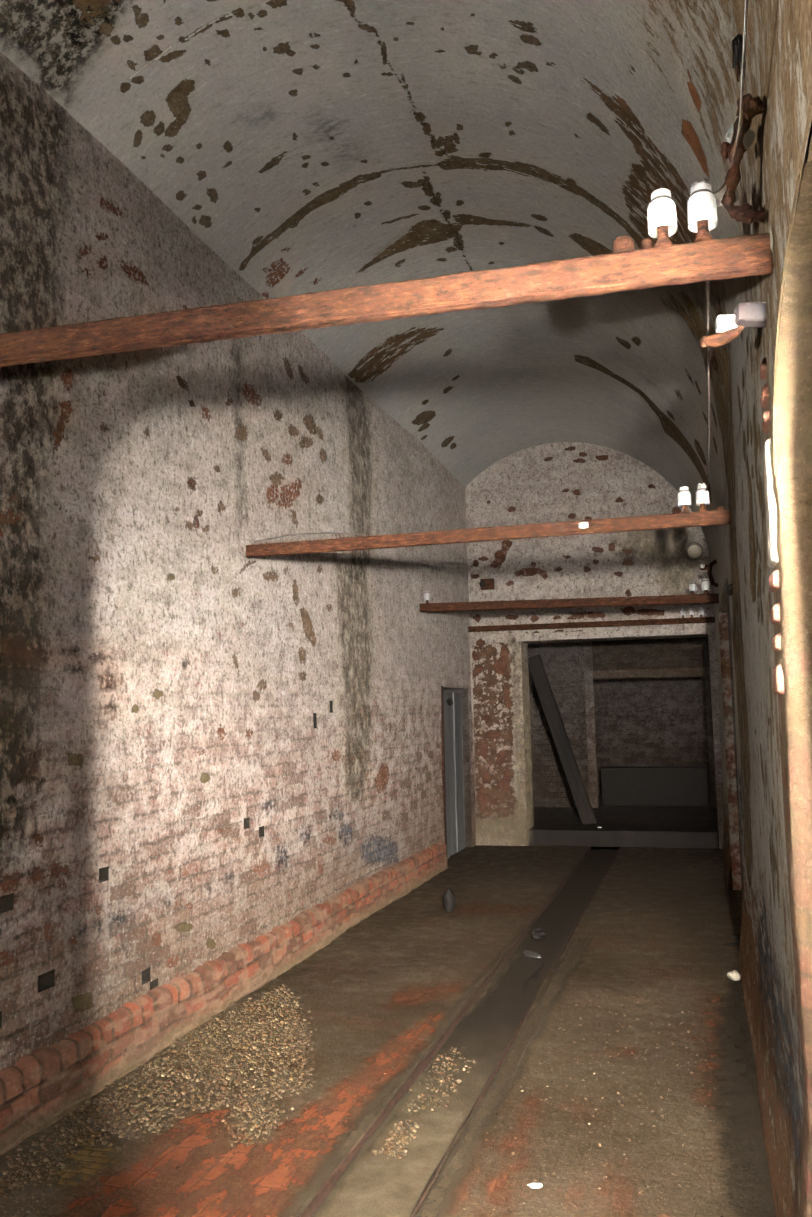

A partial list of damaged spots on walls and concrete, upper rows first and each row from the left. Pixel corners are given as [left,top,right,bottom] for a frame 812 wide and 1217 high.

damp [0,0,126,333]
peeling [133,79,195,164]
peeling [120,0,287,93]
crack [239,0,642,272]
spalling [681,69,710,179]
damp [0,361,56,855]
spalling [261,409,327,528]
peeling [471,540,513,579]
peeling [583,543,665,616]
peeling [737,332,785,695]
peeling [472,611,606,820]
damp [710,971,776,1217]